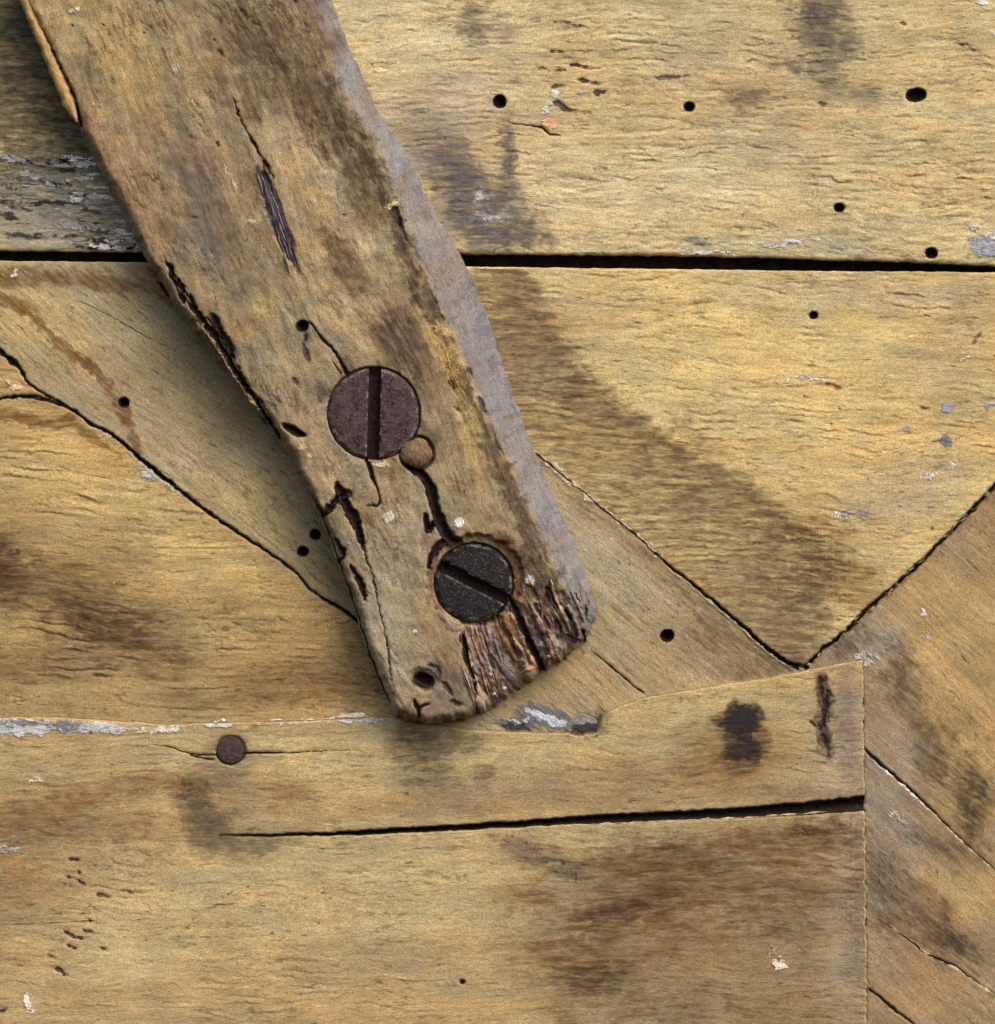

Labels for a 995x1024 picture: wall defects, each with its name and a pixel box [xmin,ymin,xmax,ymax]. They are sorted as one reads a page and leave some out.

crack [233,98,274,180]
crack [157,257,305,439]
crack [0,349,430,718]
leakage [473,268,876,678]
spalling [428,556,599,734]
crack [220,796,864,837]